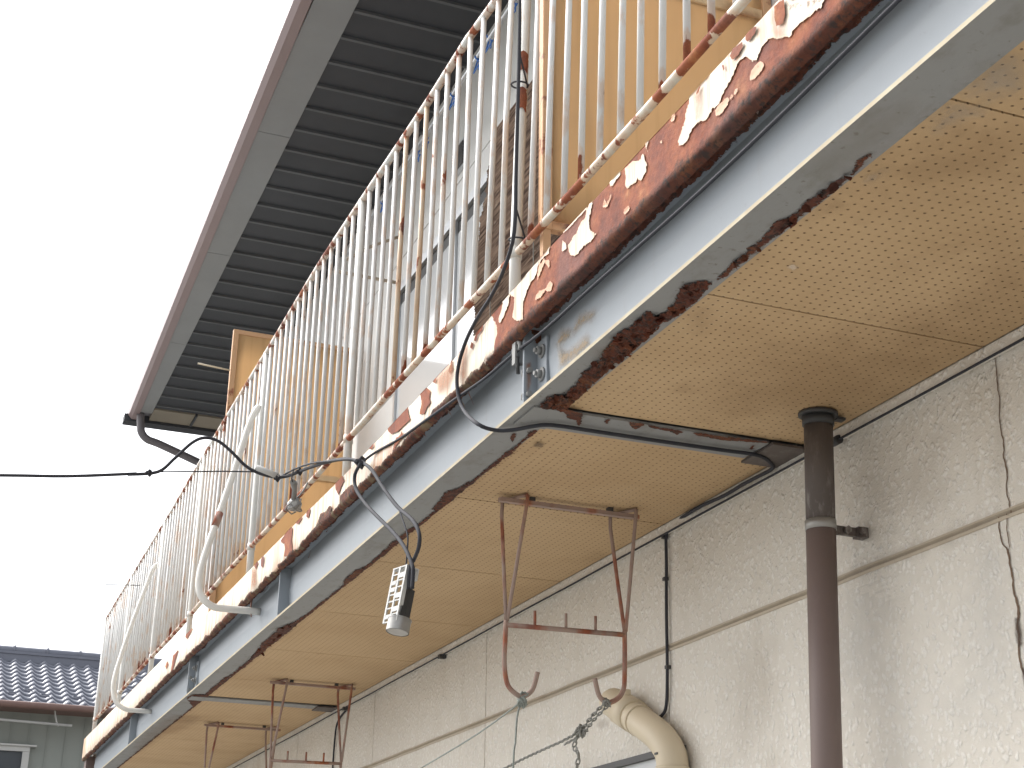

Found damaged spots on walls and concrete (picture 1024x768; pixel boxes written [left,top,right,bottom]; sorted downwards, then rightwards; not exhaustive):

peeling [490,0,843,367]
corrosion [82,0,872,761]
crack [995,360,1024,678]